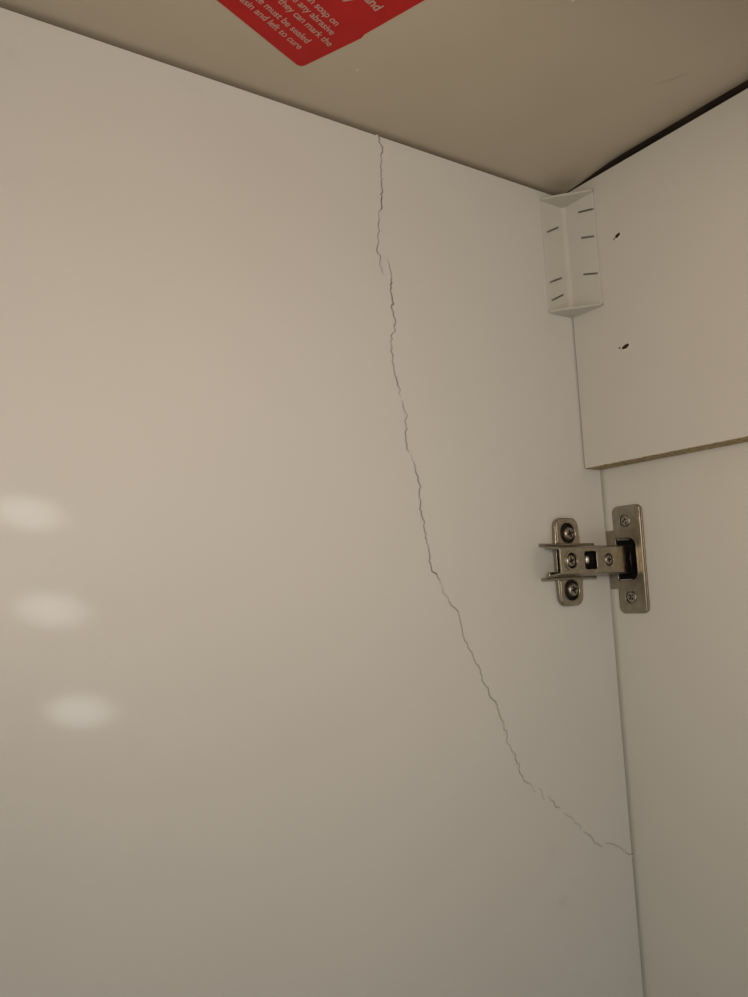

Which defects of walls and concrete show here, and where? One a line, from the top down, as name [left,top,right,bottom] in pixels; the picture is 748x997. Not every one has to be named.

crack [374,134,633,857]